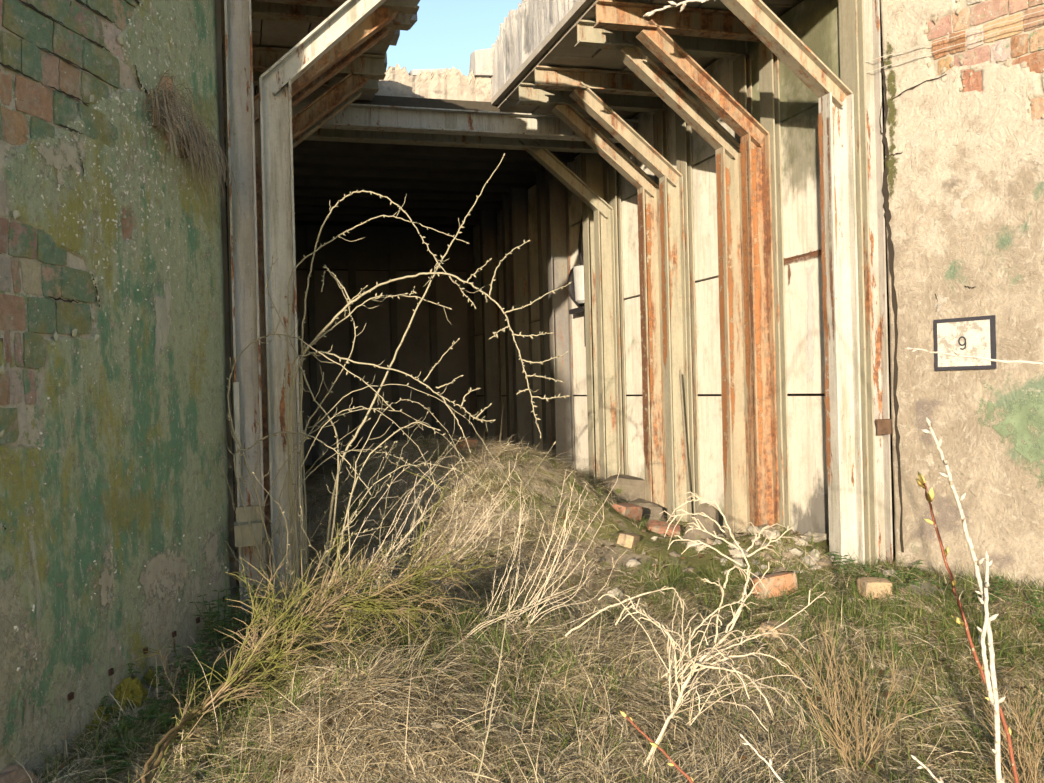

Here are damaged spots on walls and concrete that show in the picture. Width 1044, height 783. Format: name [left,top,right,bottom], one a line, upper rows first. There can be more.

flaking render [0,0,159,450]
corrosion [716,141,769,474]
corrosion [784,108,837,483]
crack [880,61,947,553]
flaking render [924,0,1044,120]
peeling [976,383,1044,485]